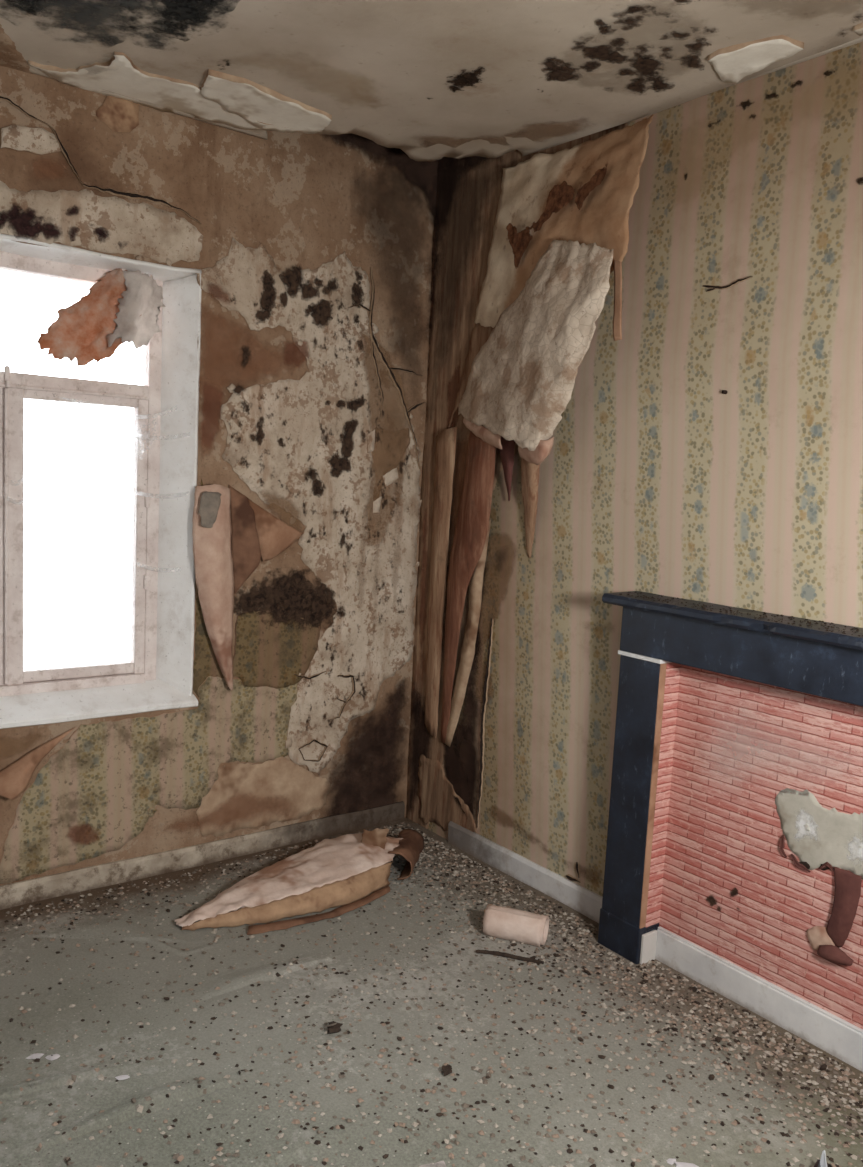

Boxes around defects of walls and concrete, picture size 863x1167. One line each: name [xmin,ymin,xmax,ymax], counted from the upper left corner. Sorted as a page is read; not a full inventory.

crack [0,96,201,225]
peeling [95,96,140,133]
water stain [1,0,238,49]
water stain [447,67,485,93]
water stain [538,6,715,93]
peeling [0,123,628,837]
water stain [333,509,352,568]
water stain [233,568,355,674]
water stain [444,535,514,817]
water stain [327,680,431,817]